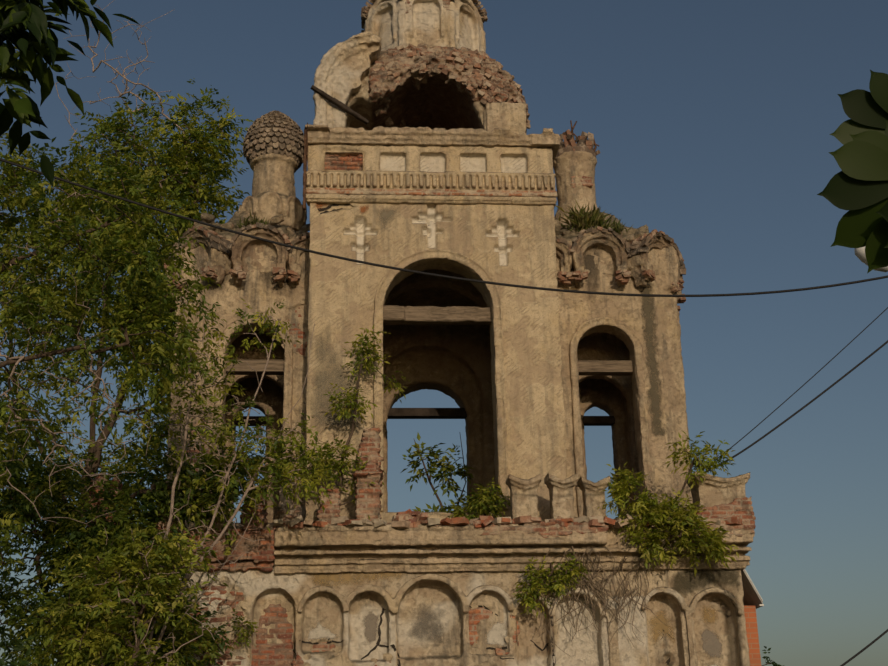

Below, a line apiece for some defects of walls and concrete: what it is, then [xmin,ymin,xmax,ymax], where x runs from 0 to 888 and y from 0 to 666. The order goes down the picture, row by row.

flaking render [281,297,308,356]
flaking render [481,522,611,538]
flaking render [698,508,756,537]
flaking render [184,575,342,666]
crack [293,634,343,656]
crack [361,608,401,666]